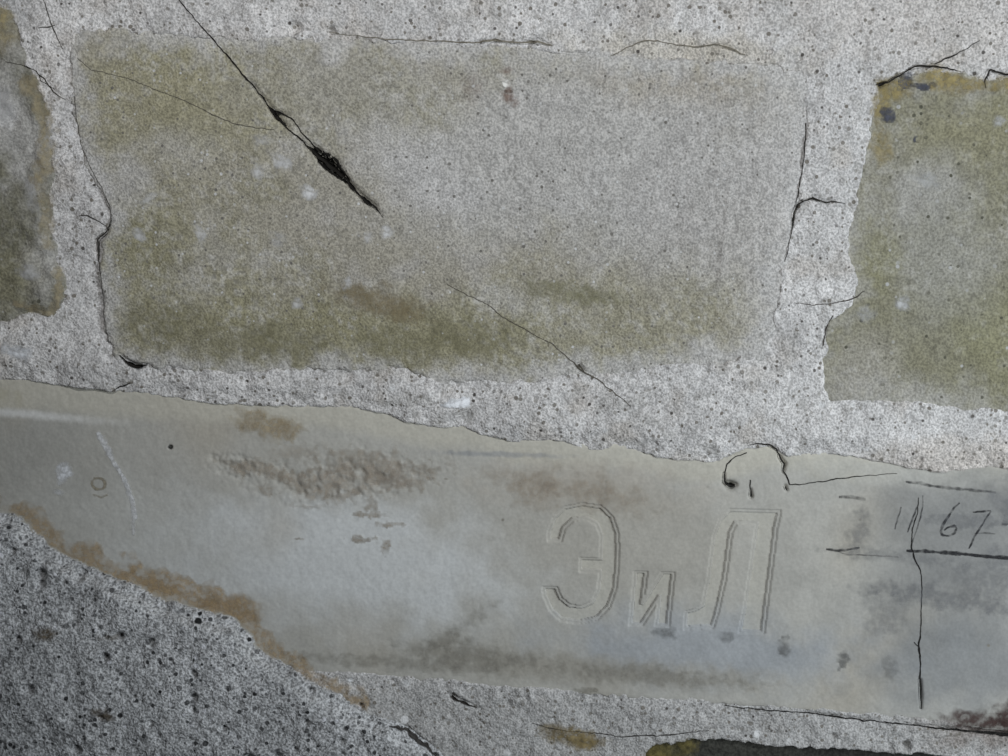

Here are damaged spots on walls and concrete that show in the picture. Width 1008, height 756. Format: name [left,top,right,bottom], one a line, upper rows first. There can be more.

crack [329,32,552,46]
crack [611,40,745,56]
crack [39,0,383,217]
crack [449,285,630,406]
crack [723,443,897,497]